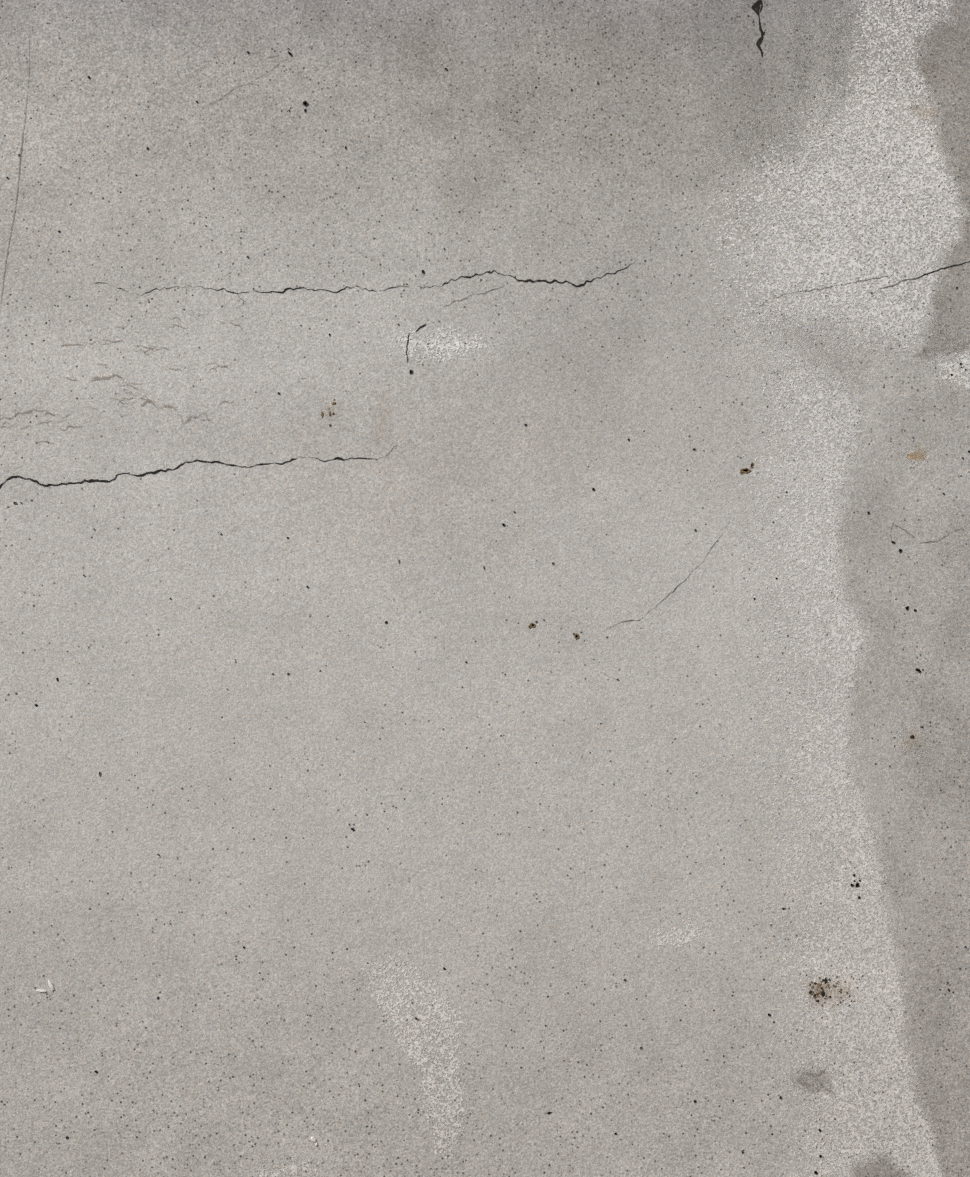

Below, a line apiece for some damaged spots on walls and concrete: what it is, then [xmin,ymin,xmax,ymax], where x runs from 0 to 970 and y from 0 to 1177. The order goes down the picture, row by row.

crack [747,0,765,57]
crack [97,263,633,362]
crack [0,445,397,488]
water stain [681,0,970,1177]